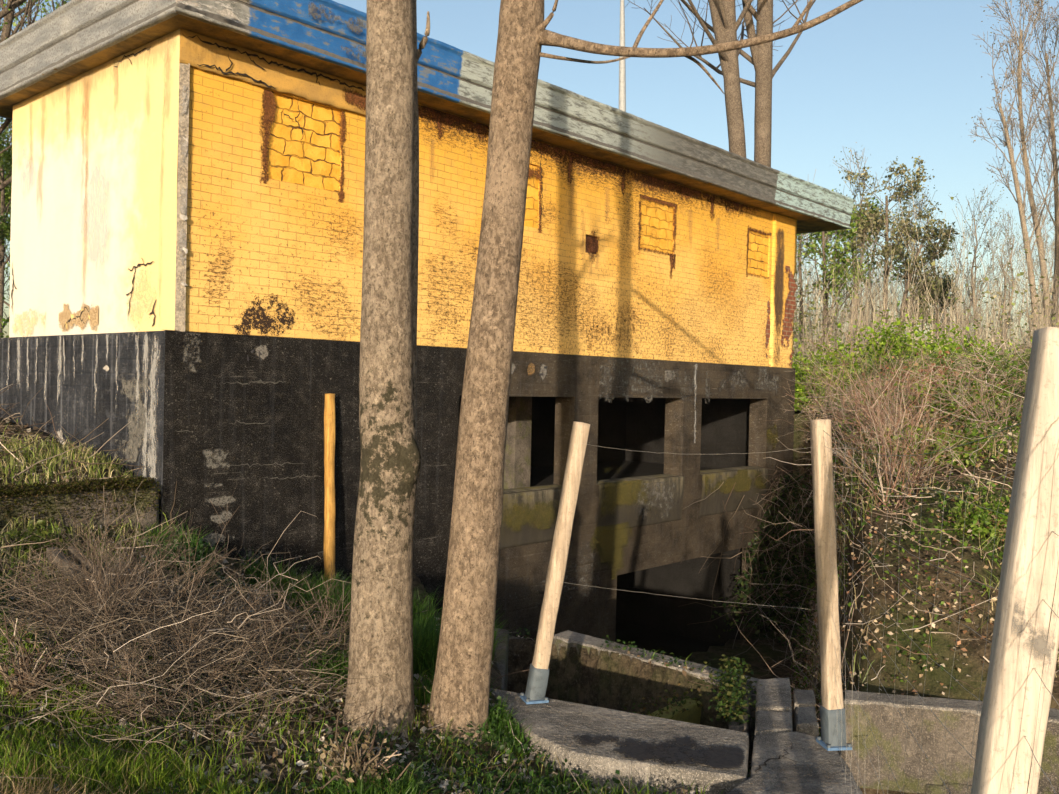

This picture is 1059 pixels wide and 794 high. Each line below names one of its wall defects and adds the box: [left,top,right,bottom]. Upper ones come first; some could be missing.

crack [186,35,365,144]
damp [419,106,489,157]
damp [530,146,735,271]
spalling [58,302,98,332]
crack [126,258,156,326]
damp [234,275,360,341]
damp [515,246,639,353]
damp [7,336,83,402]
damp [135,334,160,487]